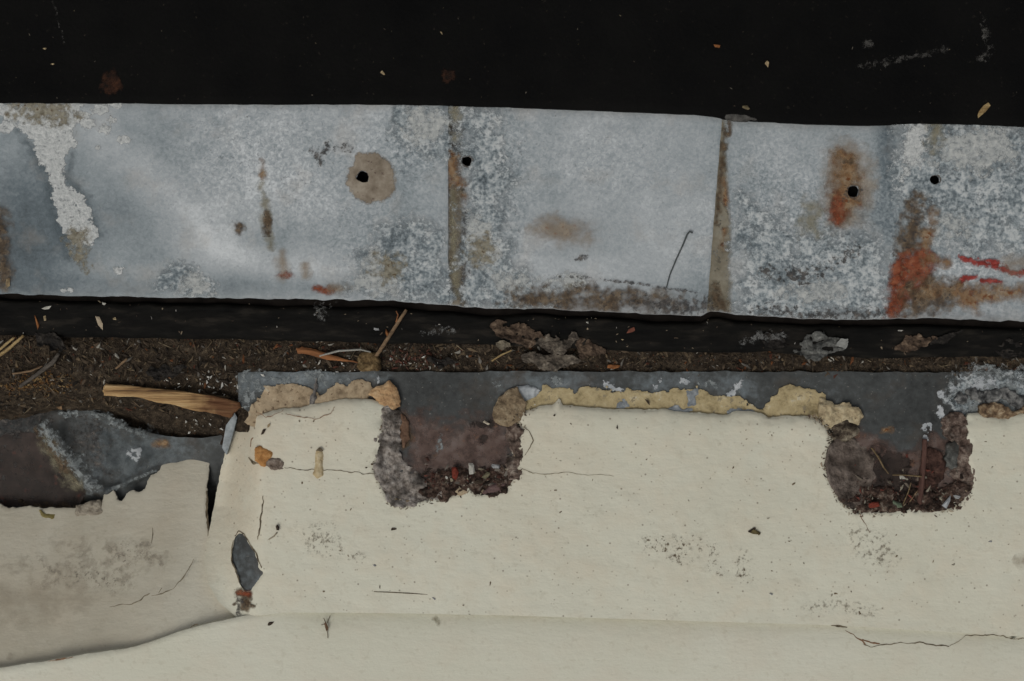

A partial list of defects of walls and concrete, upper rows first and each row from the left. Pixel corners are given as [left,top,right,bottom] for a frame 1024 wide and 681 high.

damp [0,103,131,275]
rust [308,141,396,204]
rust [448,106,468,198]
rust [829,146,870,226]
rust [885,191,1024,318]
spalling [244,378,1024,514]
peeling [75,499,103,516]
crack [831,625,1023,647]